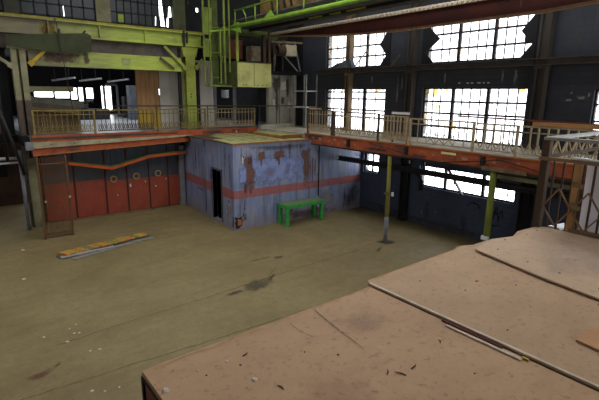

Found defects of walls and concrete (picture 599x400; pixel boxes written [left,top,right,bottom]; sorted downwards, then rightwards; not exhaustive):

corrosion [244,152,265,193]
corrosion [301,149,316,182]
leakage [228,274,274,295]